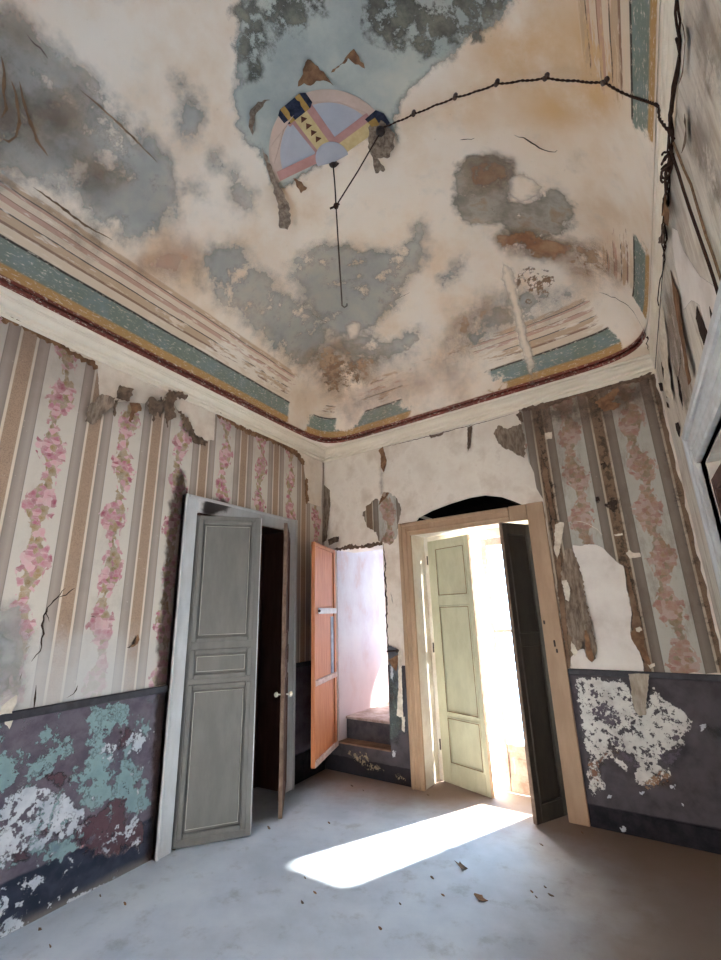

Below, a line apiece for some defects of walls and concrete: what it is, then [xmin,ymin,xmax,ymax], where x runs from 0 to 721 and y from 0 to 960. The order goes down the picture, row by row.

water stain [1,56,74,156]
water stain [453,155,574,242]
water stain [312,344,374,392]
crack [19,589,73,708]
peeling [575,677,706,798]
peeling [0,701,155,938]